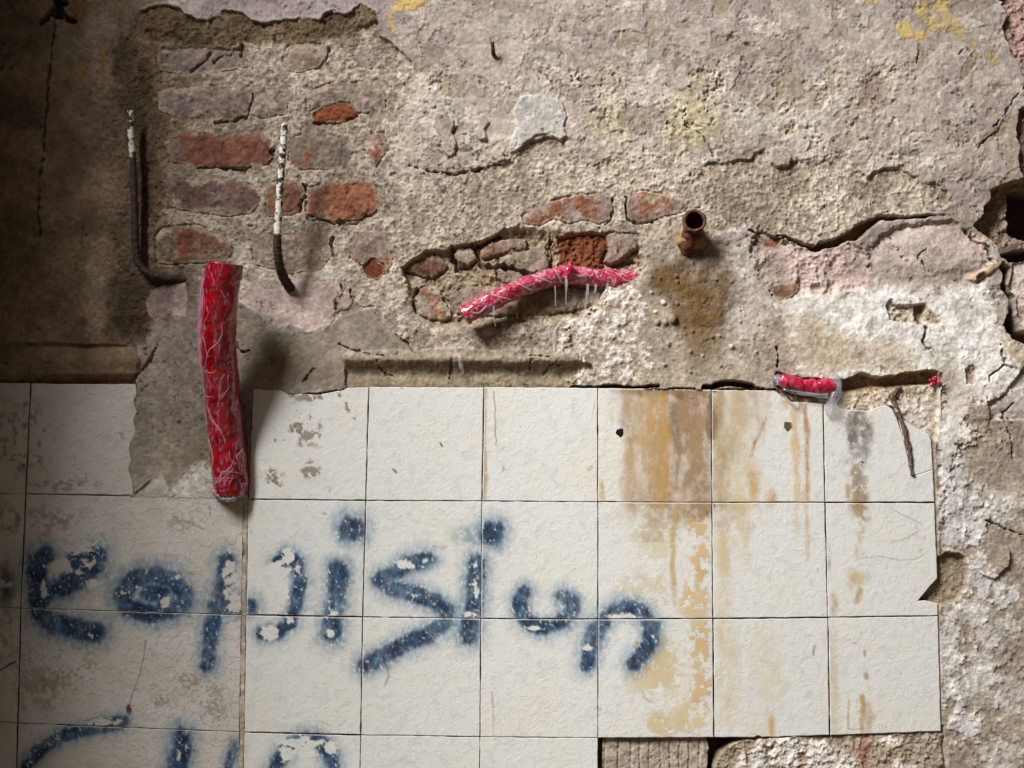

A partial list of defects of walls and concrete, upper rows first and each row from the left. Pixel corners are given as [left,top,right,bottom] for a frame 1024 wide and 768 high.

spalling [999,0,1024,76]
spalling [100,5,951,352]
spalling [973,109,1024,344]
rust [652,259,732,344]
rust [622,390,725,516]
rust [792,403,809,470]